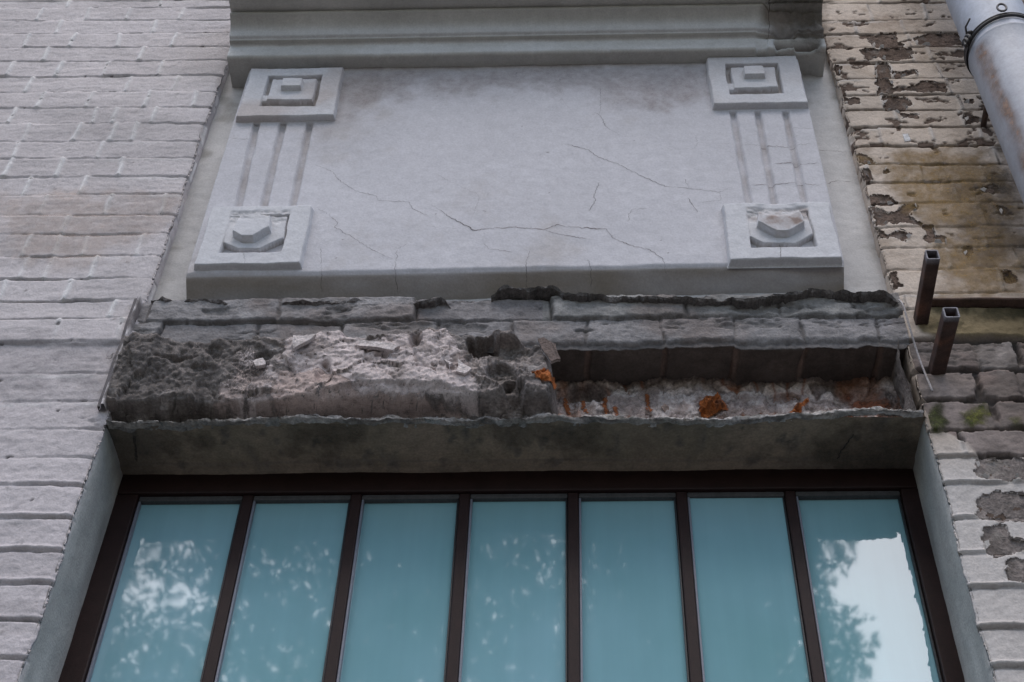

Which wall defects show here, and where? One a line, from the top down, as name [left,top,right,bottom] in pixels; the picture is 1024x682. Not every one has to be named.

peeling [835,64,860,105]
peeling [859,32,962,119]
peeling [963,98,990,125]
peeling [858,153,947,243]
peeling [890,271,904,289]
spalling [538,337,560,364]
spalling [111,328,480,419]
corrosion [531,368,589,414]
corrosion [699,392,728,418]
corrosion [789,397,809,413]
peeling [973,457,1024,583]